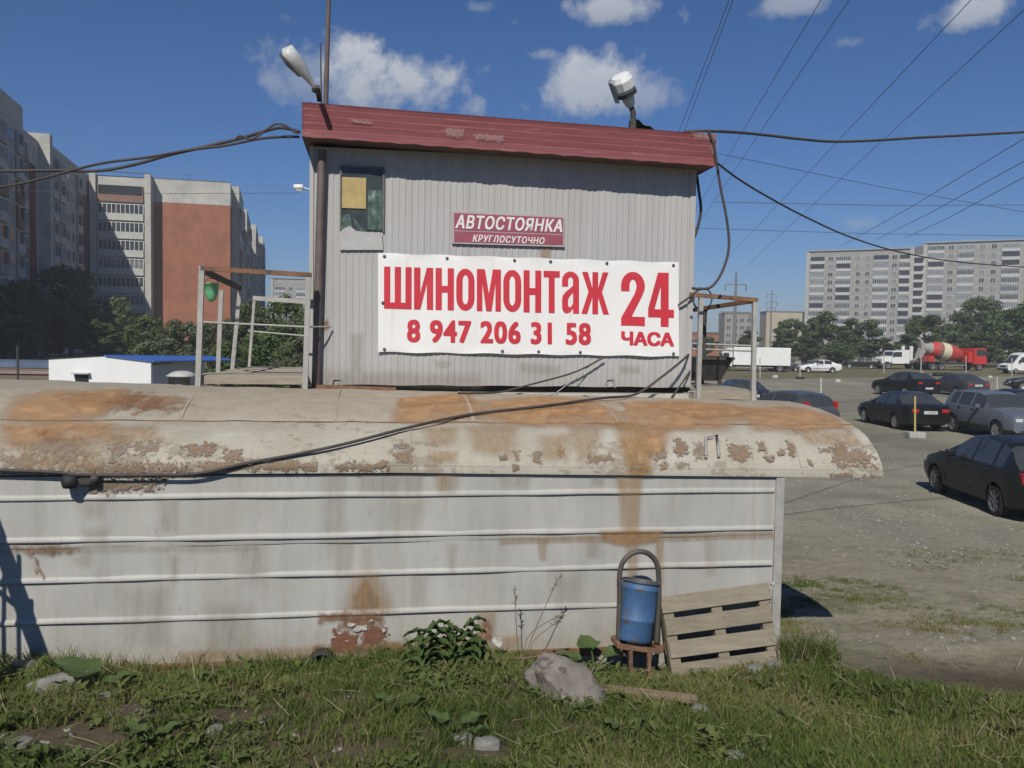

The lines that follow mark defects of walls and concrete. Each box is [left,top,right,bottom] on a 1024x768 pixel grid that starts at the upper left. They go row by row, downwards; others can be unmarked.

corrosion [2,389,184,462]
peeling [0,429,322,497]
peeling [334,440,414,473]
peeling [499,450,543,472]
peeling [586,453,615,465]
corrosion [397,393,855,559]
peeling [628,436,708,472]
peeling [725,437,883,478]
corrosion [352,580,383,610]
peeling [315,613,403,654]